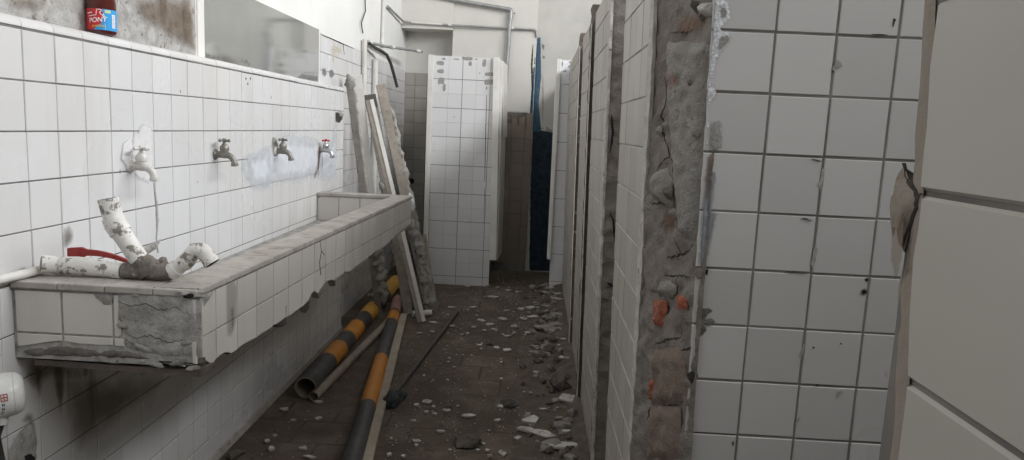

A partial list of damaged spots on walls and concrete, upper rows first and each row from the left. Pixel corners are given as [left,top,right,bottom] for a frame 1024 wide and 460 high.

crack [655,81,673,173]
spalling [628,0,730,460]
spalling [24,286,213,371]